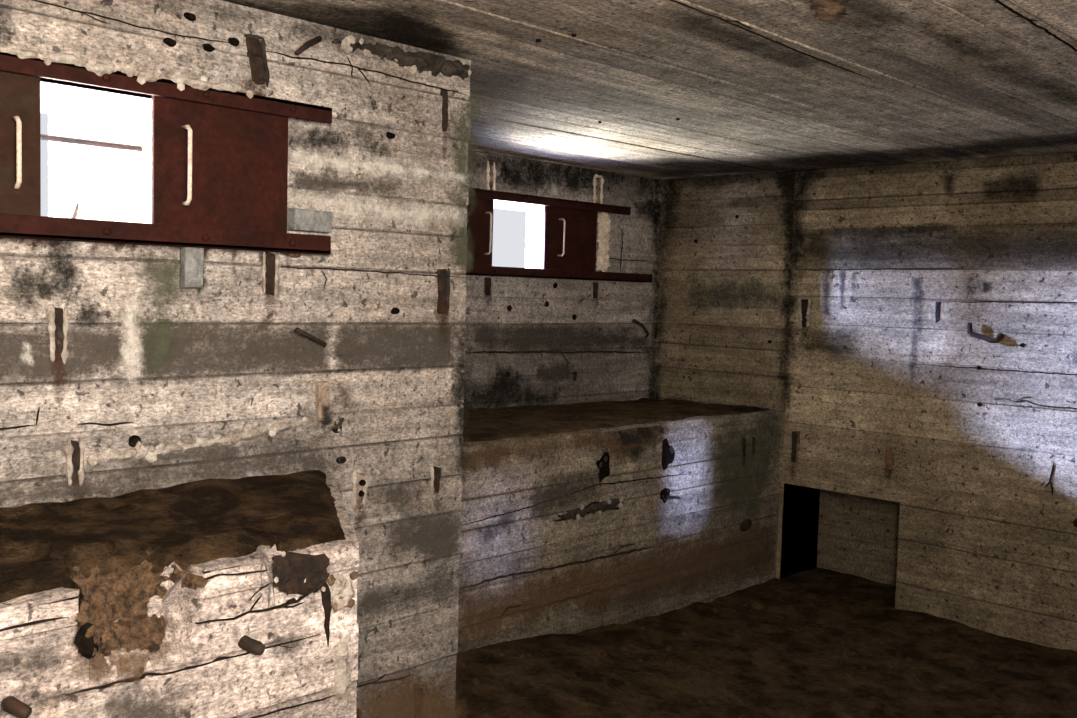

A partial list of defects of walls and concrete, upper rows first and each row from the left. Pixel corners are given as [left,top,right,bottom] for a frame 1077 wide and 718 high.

spalling [0,43,254,98]
leakage [0,95,681,483]
leakage [481,470,598,541]
spalling [70,560,207,657]
spalling [272,550,359,612]